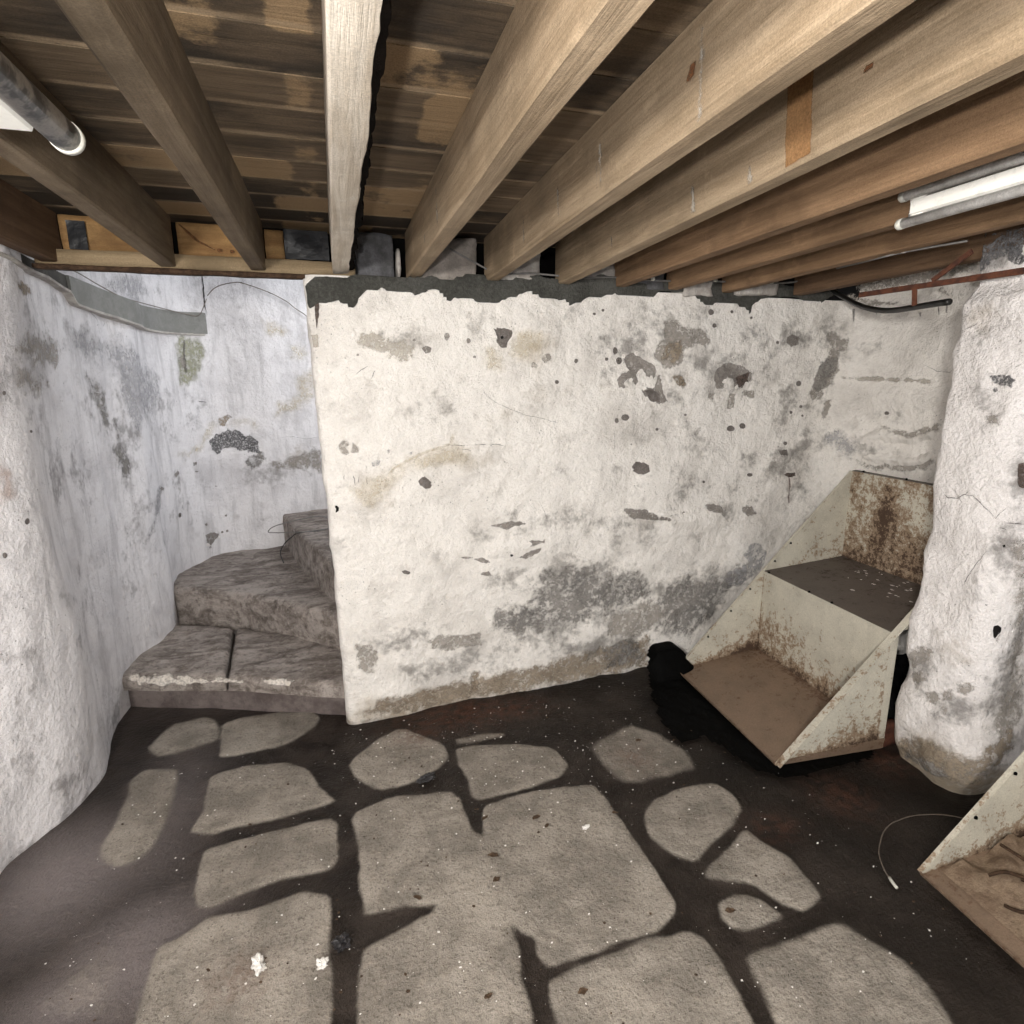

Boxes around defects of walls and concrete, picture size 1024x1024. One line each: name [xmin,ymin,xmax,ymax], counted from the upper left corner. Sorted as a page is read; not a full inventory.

peeling [605,347,668,408]
peeling [714,363,755,392]
spalling [990,372,1017,392]
damp [366,545,766,714]
damp [355,645,378,672]